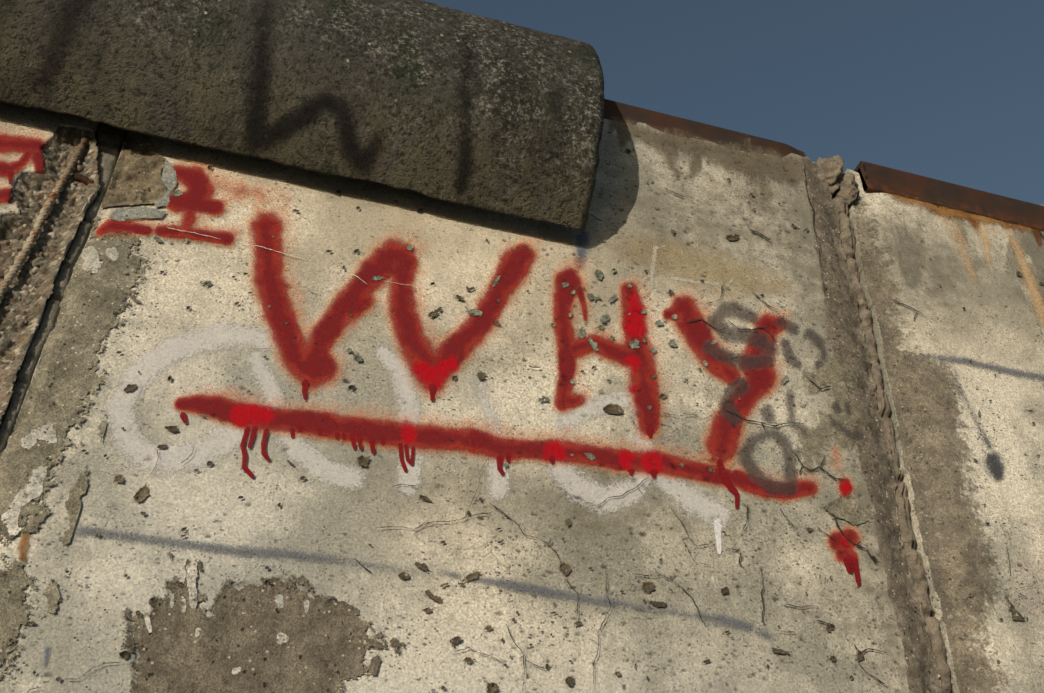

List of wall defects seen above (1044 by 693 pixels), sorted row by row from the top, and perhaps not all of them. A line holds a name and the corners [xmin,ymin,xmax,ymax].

corrosion [888,191,1044,323]
leakage [1007,226,1044,313]
peeling [0,125,182,684]
peeling [792,157,1028,693]
peeling [118,552,406,693]